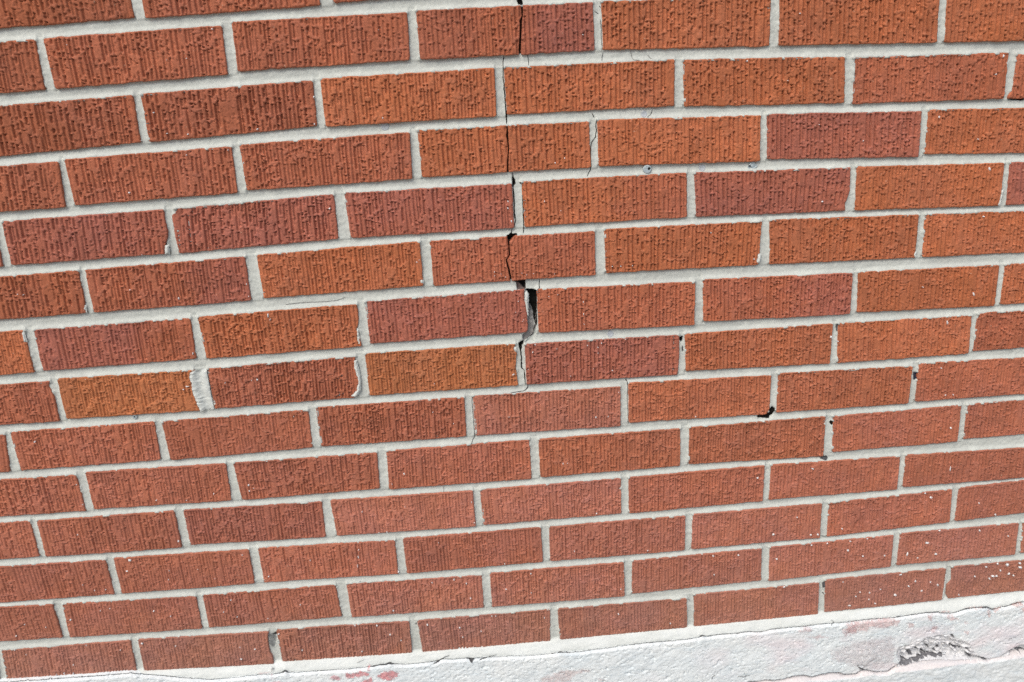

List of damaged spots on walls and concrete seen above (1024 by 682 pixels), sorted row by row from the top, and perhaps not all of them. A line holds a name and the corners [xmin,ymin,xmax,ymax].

crack [503,0,540,393]
spalling [896,634,1024,667]